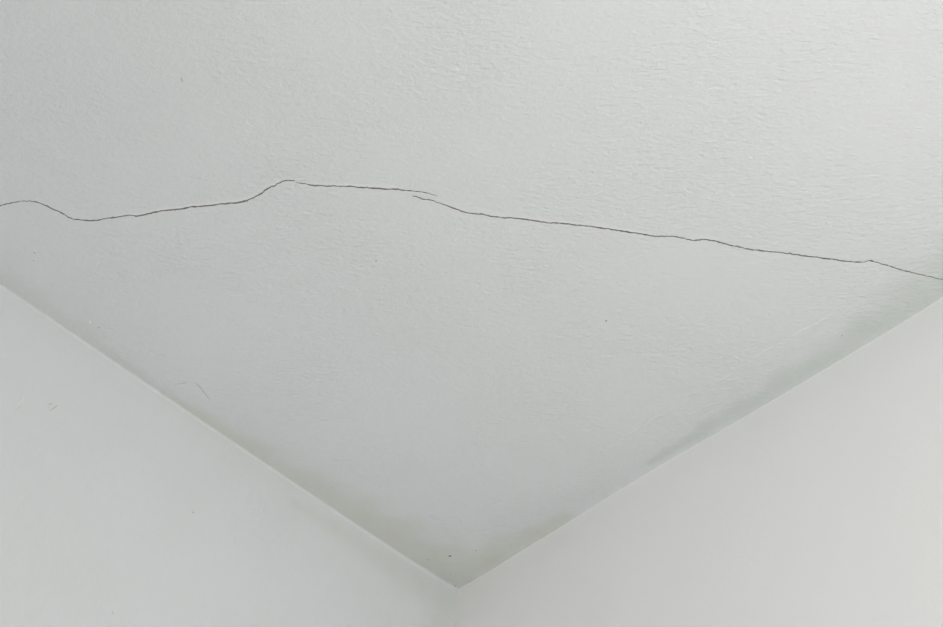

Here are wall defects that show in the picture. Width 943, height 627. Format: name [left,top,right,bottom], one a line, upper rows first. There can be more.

crack [0,179,943,280]